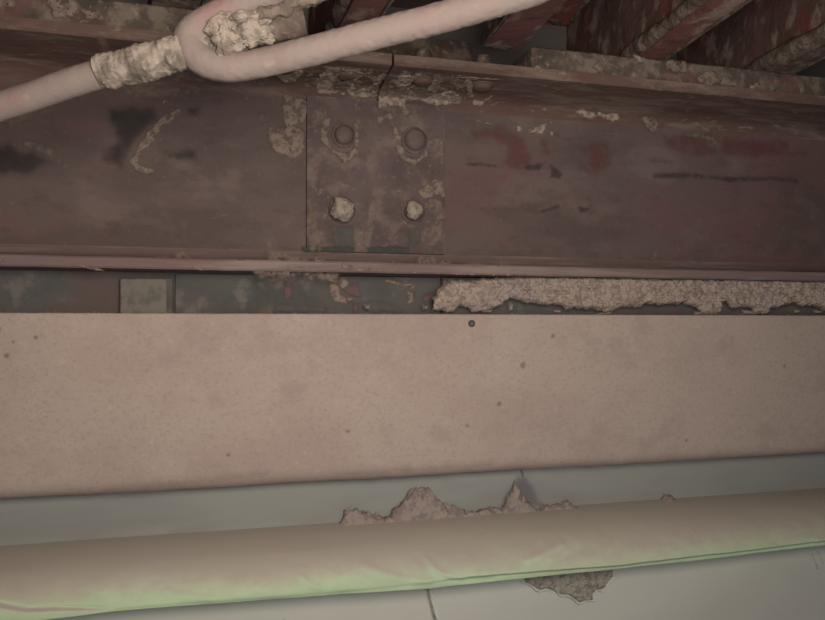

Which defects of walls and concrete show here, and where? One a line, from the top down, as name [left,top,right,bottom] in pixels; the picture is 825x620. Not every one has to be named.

peeling [239,69,361,164]
peeling [316,67,500,165]
peeling [417,179,445,246]
peeling [252,270,325,312]
spalling [304,273,825,315]
crack [427,589,438,620]
spalling [522,570,615,604]